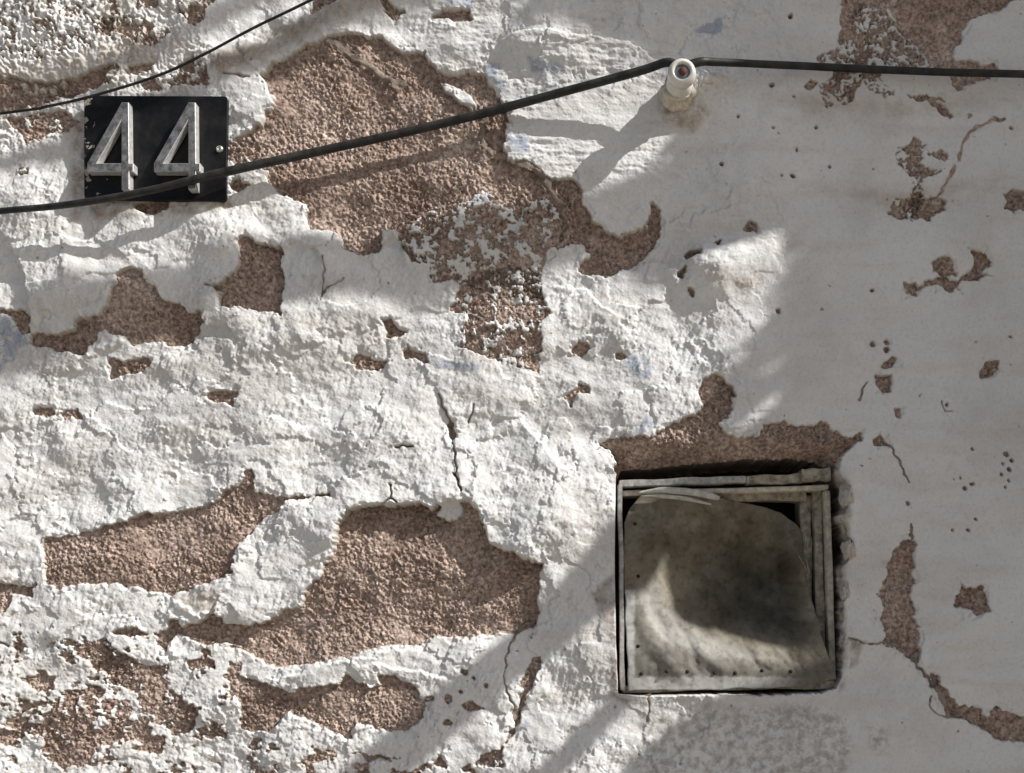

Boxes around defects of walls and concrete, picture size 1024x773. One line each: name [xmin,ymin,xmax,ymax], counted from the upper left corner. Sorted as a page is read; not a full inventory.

spalling [0,0,169,59]
spalling [0,61,209,143]
spalling [804,0,1013,108]
spalling [214,35,661,373]
spalling [888,138,947,222]
spalling [0,238,204,356]
spalling [903,251,991,297]
spalling [600,375,887,481]
spalling [0,416,543,773]
spalling [879,535,920,660]
crack [503,622,532,720]
spalling [931,674,1024,742]